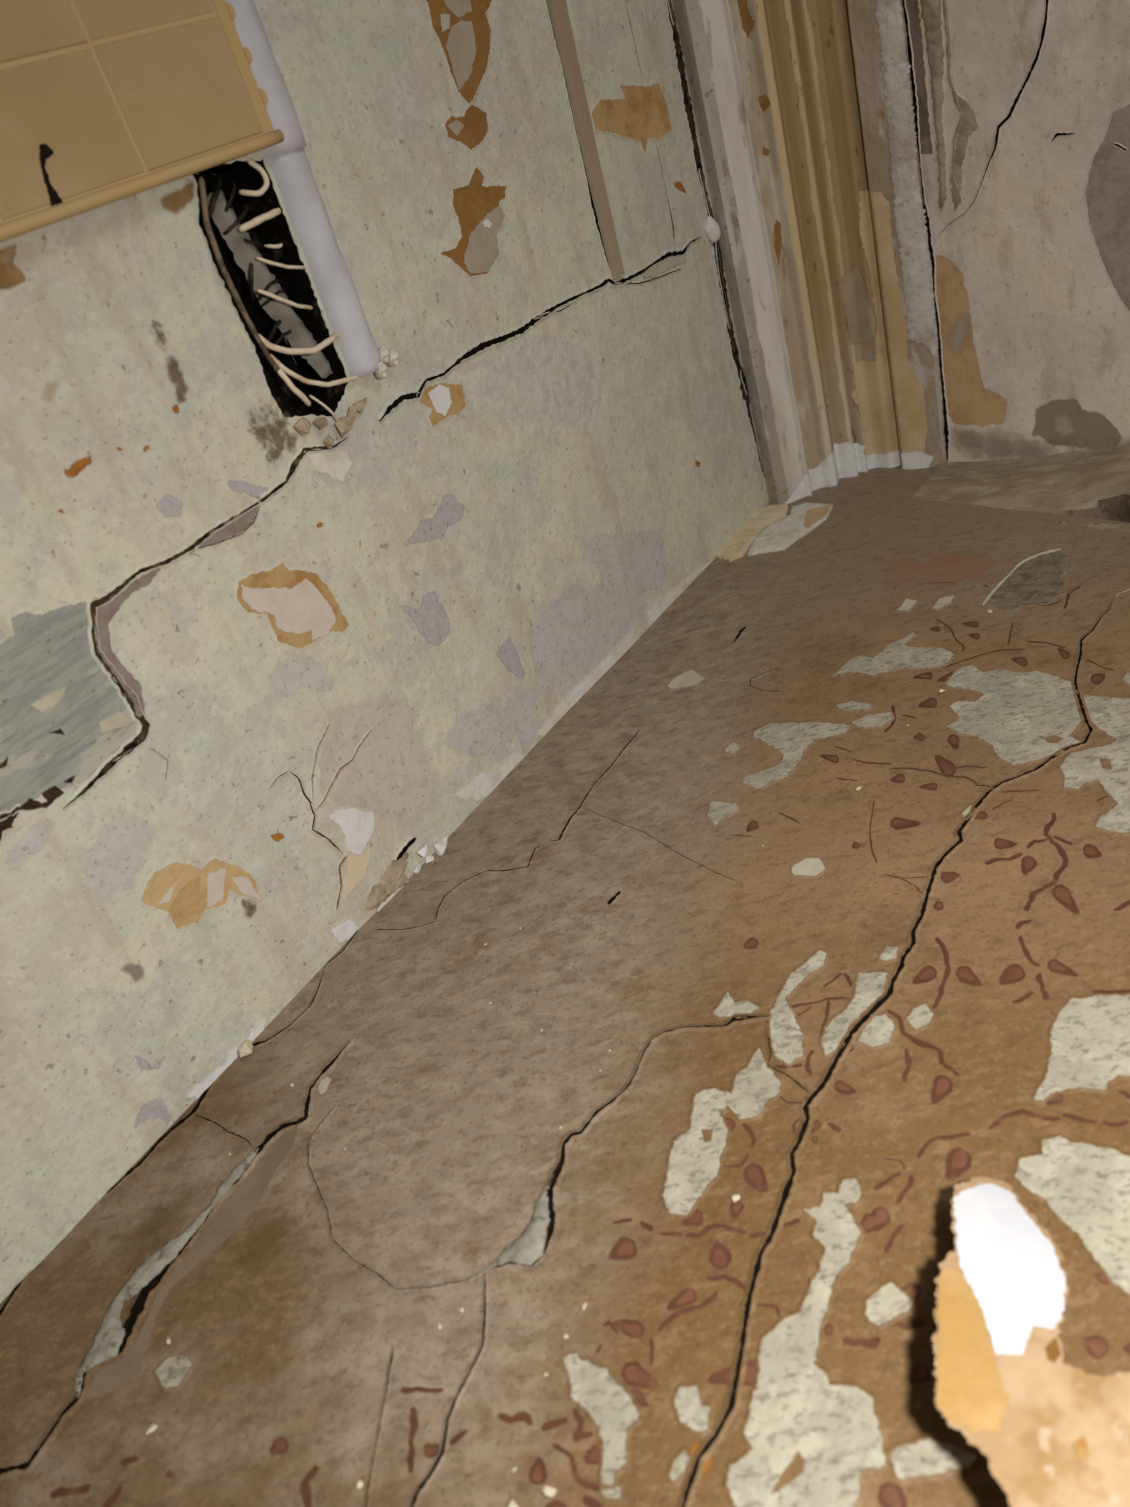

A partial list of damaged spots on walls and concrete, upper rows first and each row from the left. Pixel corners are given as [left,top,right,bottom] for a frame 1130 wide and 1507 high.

peeling [423,0,508,279]
crack [901,0,1051,462]
peeling [1083,102,1130,314]
crack [61,0,766,811]
peeling [234,560,351,652]
peeling [16,775,75,811]
peeling [139,856,262,932]
crack [0,597,1118,1507]
peeling [1030,992,1130,1105]
peeling [1010,1132,1130,1301]
peeling [152,1352,196,1393]